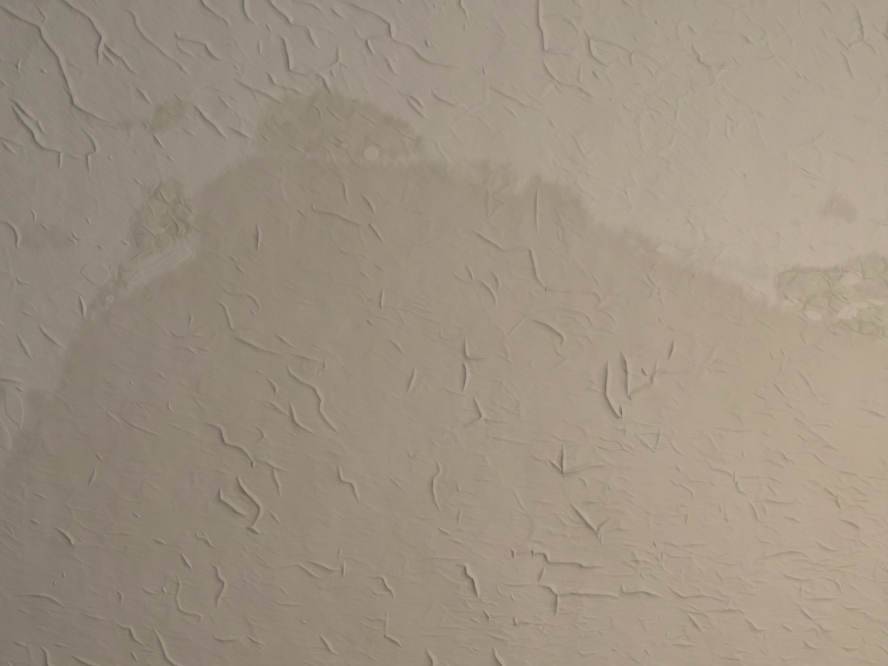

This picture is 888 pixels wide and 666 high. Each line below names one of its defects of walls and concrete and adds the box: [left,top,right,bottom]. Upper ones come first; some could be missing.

leakage [240,74,455,173]
leakage [428,147,500,207]
leakage [553,177,601,233]
leakage [616,220,658,270]
leakage [637,229,773,294]
peeling [836,299,884,319]
leakage [0,377,71,467]